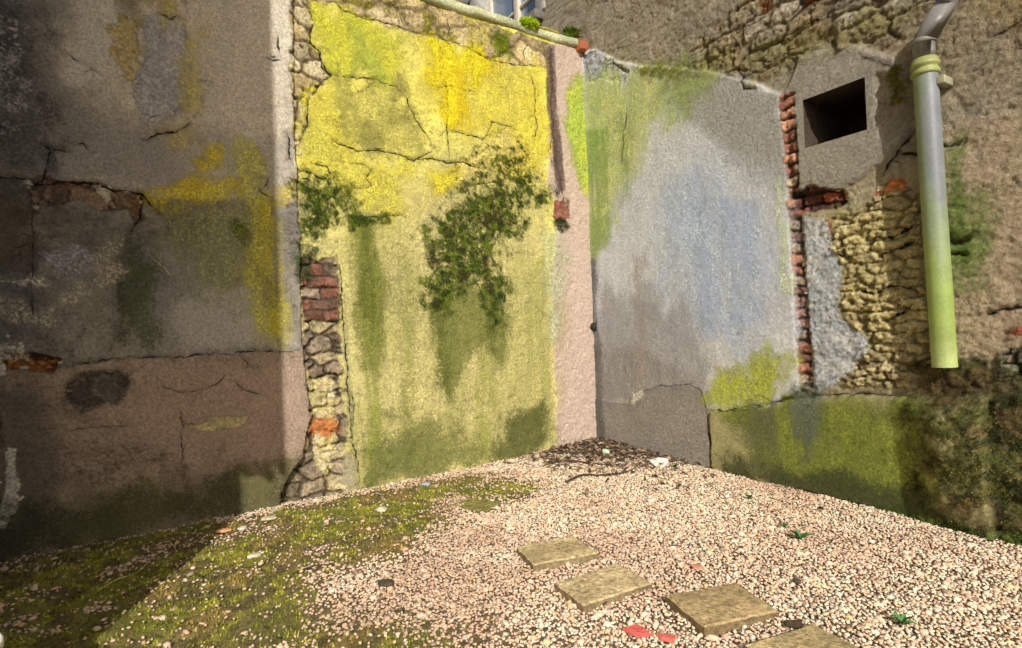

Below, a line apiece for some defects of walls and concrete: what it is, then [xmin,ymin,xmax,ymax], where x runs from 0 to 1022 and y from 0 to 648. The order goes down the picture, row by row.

crack [145,114,189,141]
crack [287,0,564,201]
leakage [544,47,565,194]
flaking render [690,0,936,82]
crack [0,140,157,321]
flaking render [779,91,935,391]
flaking render [0,348,63,377]
flaking render [280,257,351,503]
leakage [359,225,382,487]
leakage [528,227,573,448]
flaking render [996,326,1022,381]
flaking render [0,422,24,529]